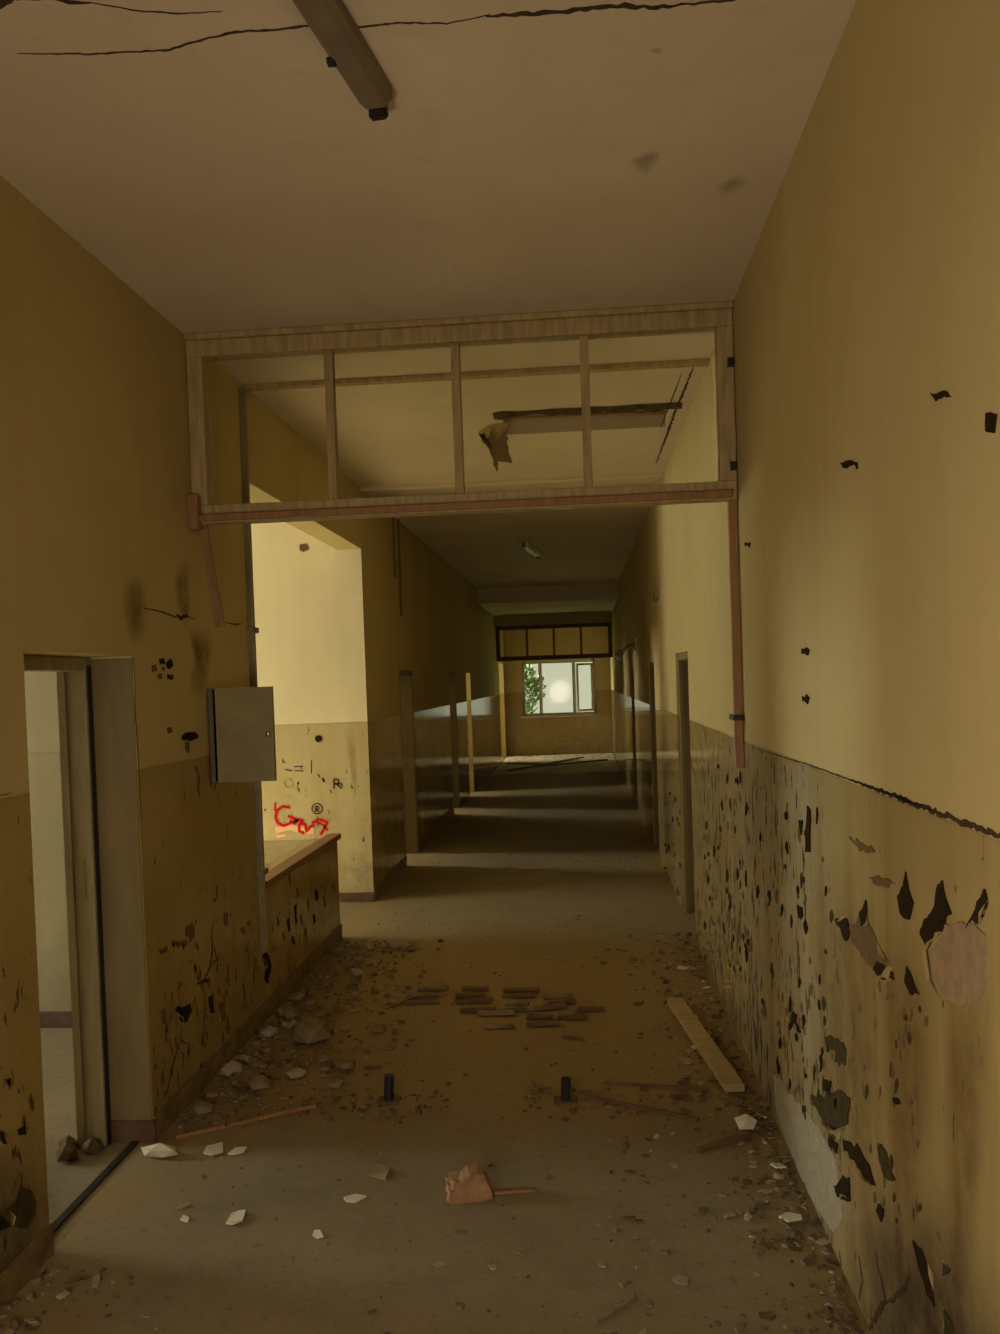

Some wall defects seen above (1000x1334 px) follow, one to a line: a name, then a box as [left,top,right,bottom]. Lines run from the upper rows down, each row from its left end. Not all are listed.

crack [0,0,309,55]
crack [357,0,736,28]
peeling [478,422,512,473]
crack [758,749,1000,839]
peeling [159,922,237,1033]
peeling [223,910,272,983]
peeling [277,882,335,945]
peeling [703,764,989,1334]
peeling [0,1094,33,1145]
peeling [0,1186,35,1252]